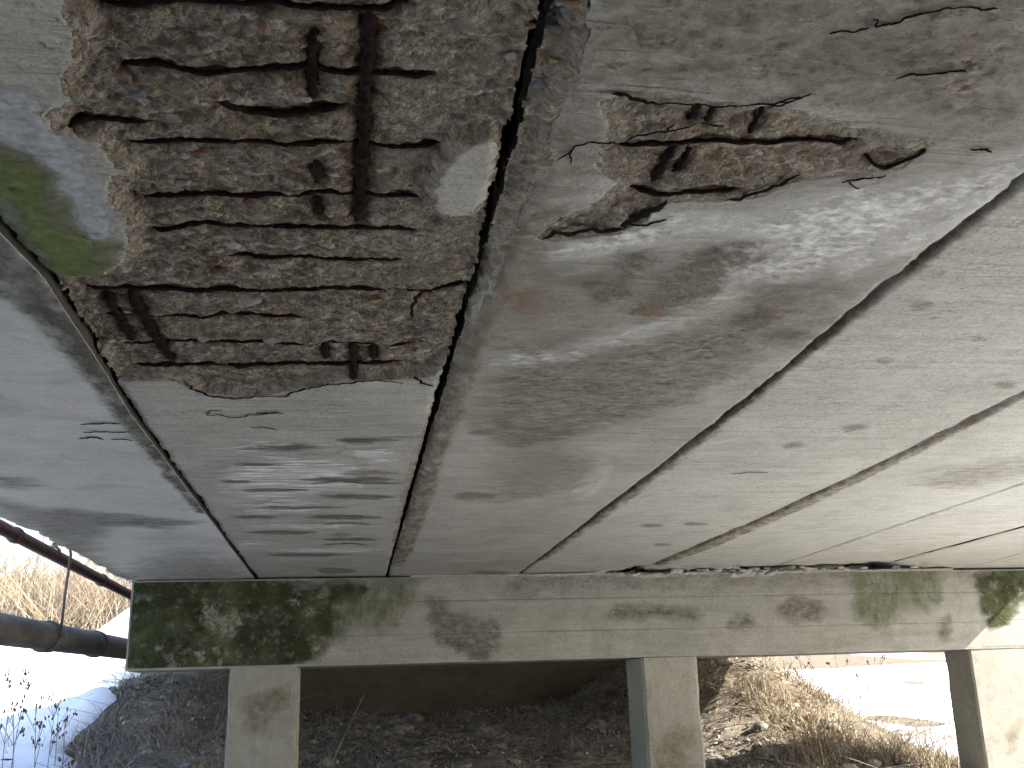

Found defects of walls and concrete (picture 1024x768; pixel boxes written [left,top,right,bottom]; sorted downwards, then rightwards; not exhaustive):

crack [829,6,998,35]
damp [0,90,112,240]
spalling [38,0,590,396]
spalling [537,91,939,241]
efflorescence [560,164,1016,278]
crack [409,288,424,318]
damp [218,439,397,557]
damp [431,602,499,660]